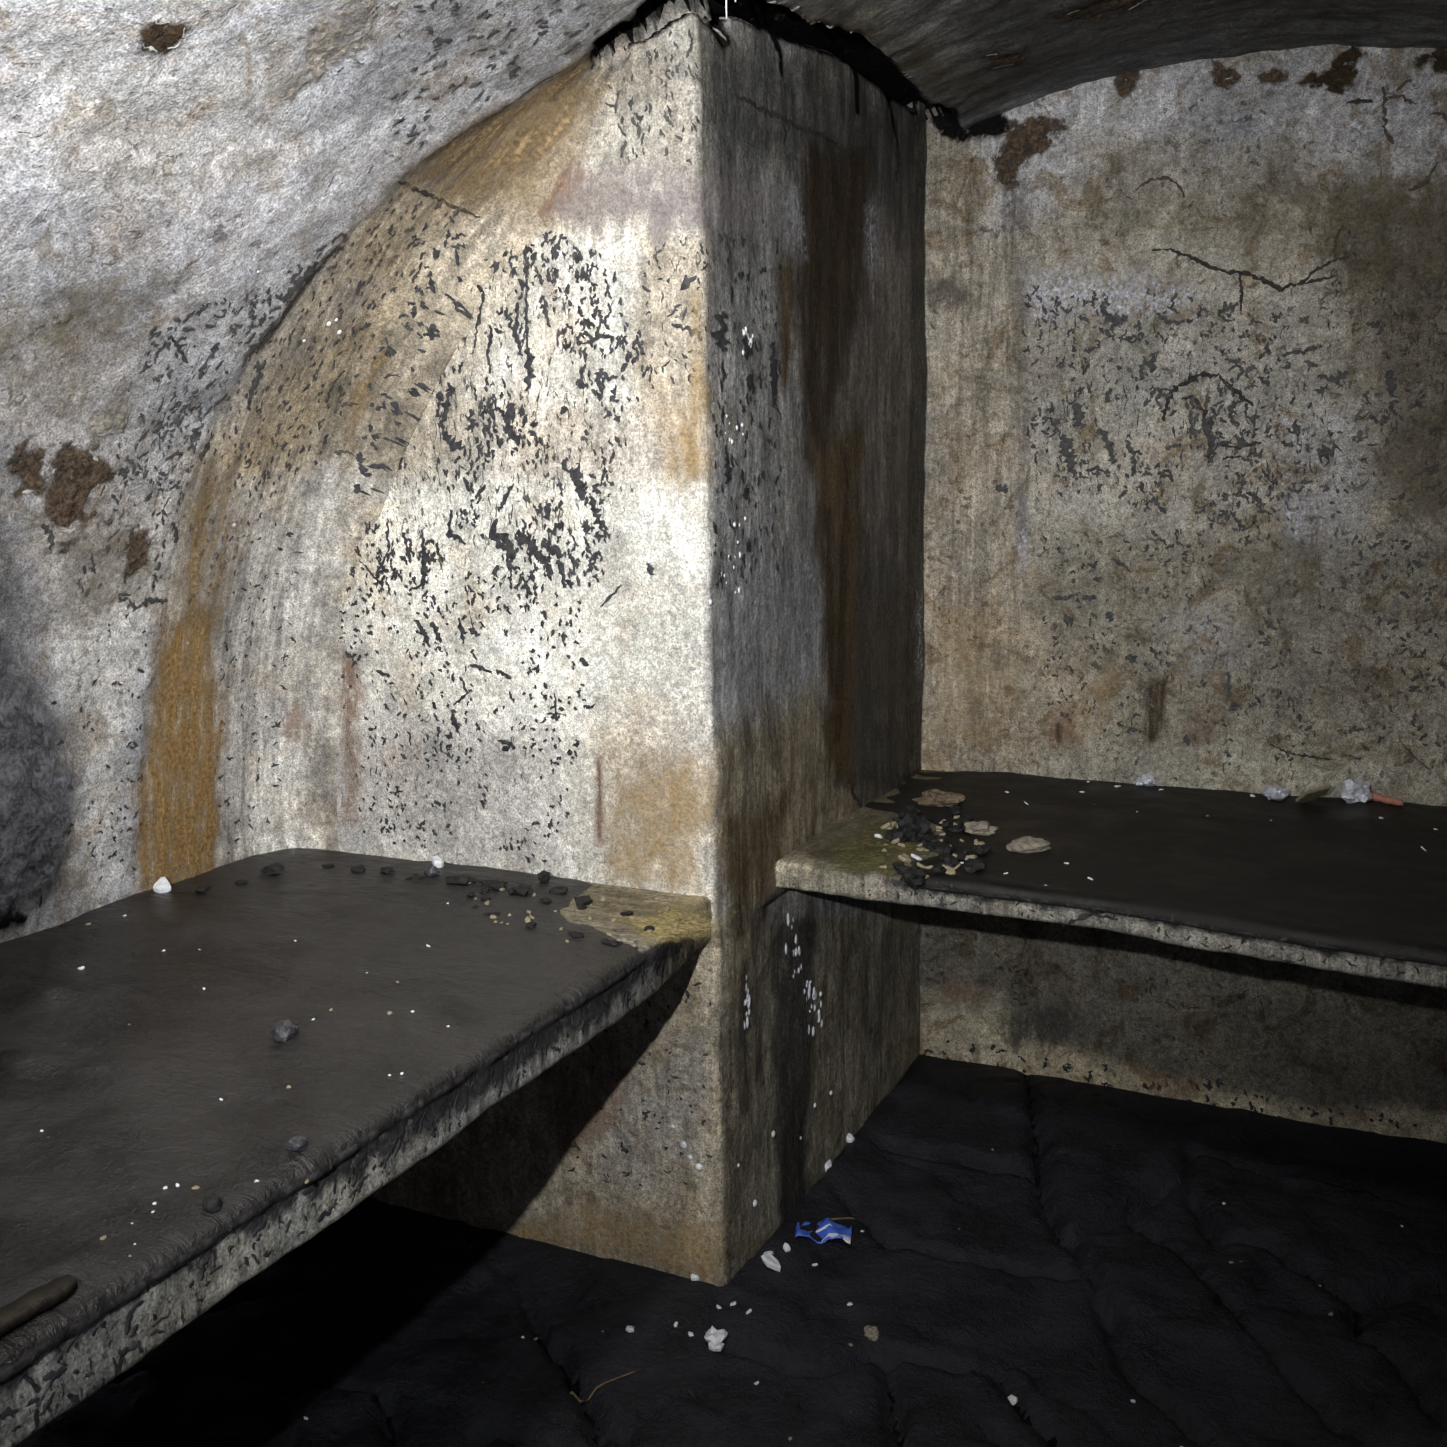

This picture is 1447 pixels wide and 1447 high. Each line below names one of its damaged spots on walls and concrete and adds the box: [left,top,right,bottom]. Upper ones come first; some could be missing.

flaking render [138,17,188,54]
flaking render [391,0,1068,190]
crack [735,94,837,144]
flaking render [1415,49,1447,77]
efflorescence [1023,272,1198,321]
crack [1151,224,1349,311]
water stain [828,113,969,808]
flaking render [6,193,784,854]
water stain [1286,498,1337,543]
corrosion [138,473,232,888]
peeling [87,723,143,871]
peeling [499,788,570,863]